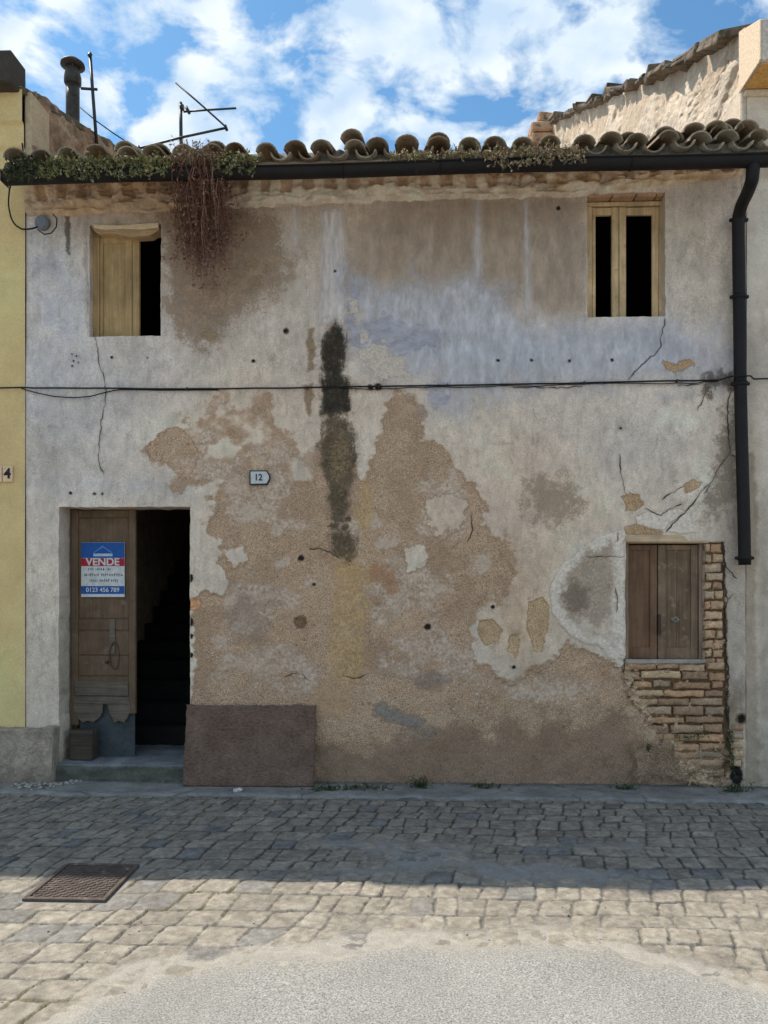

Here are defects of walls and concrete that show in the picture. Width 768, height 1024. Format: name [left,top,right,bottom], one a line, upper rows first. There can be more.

crack [94,336,107,474]
damp [158,208,297,353]
damp [304,210,359,561]
peeling [349,279,731,417]
crack [513,383,581,391]
crack [629,319,665,379]
crack [645,383,736,533]
spalling [143,390,746,787]